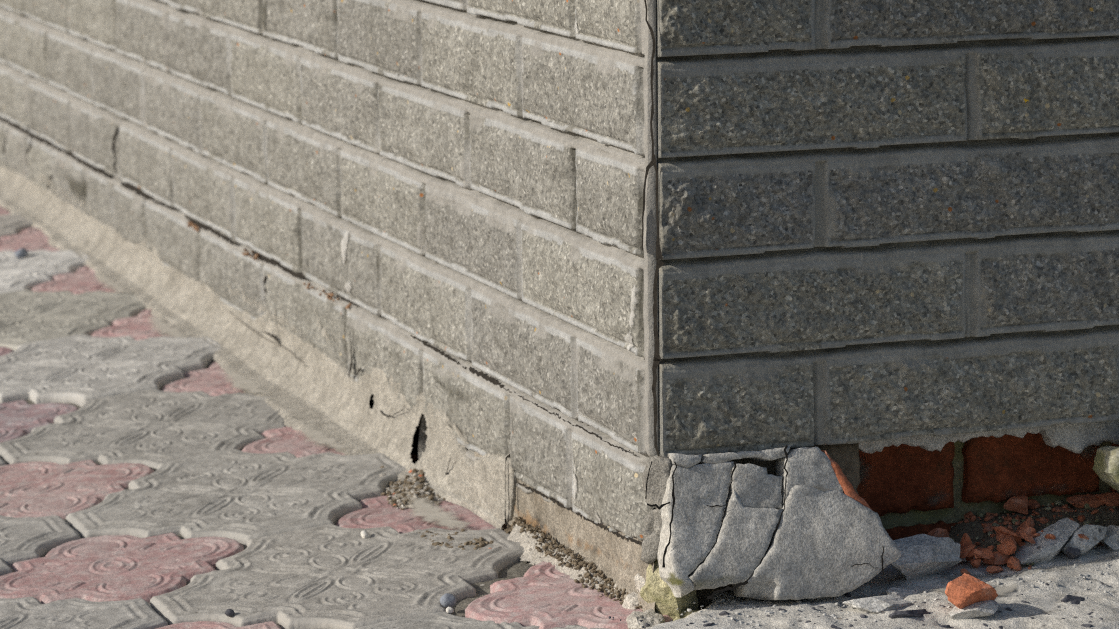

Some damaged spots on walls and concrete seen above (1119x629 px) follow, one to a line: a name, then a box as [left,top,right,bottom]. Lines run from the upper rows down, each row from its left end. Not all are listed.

crack [640,0,901,600]
spalling [856,432,1119,540]